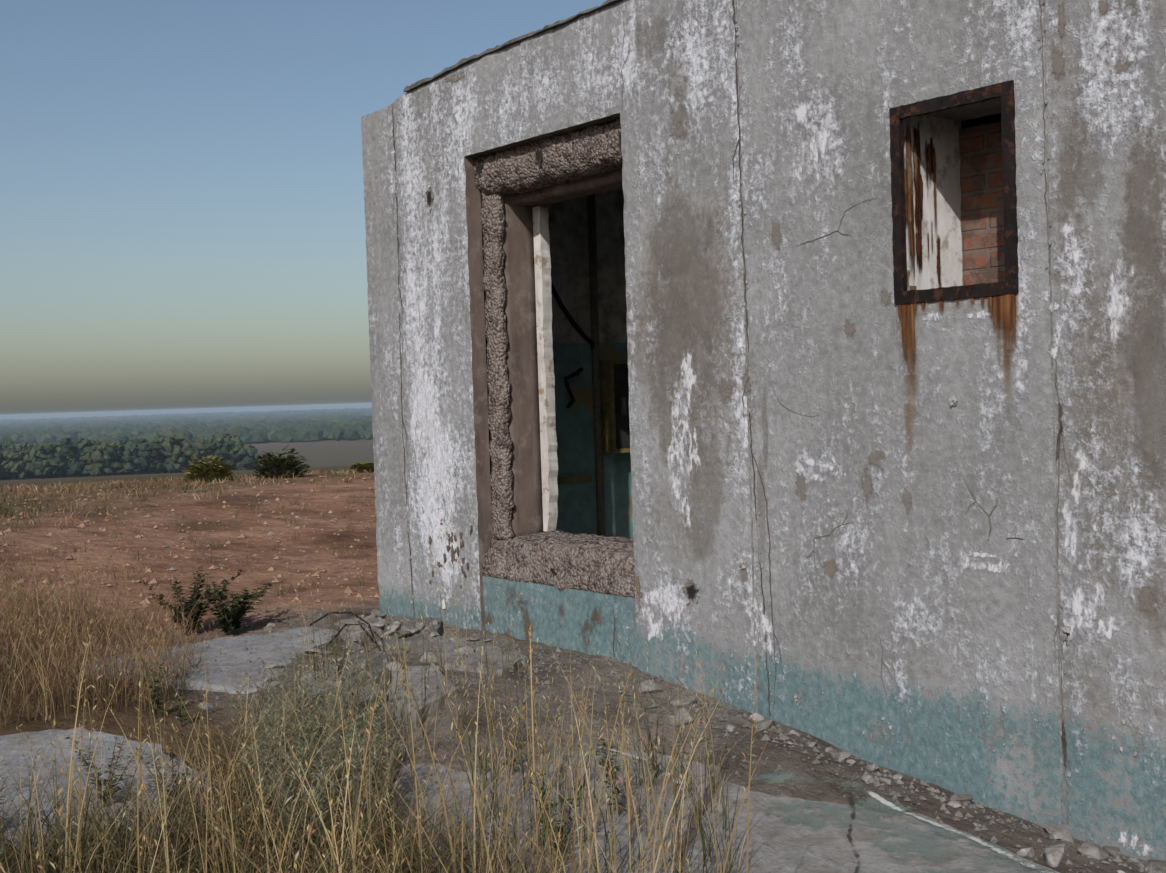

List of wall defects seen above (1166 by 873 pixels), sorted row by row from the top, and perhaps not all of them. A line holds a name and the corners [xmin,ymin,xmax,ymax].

corrosion [898,122,1016,363]